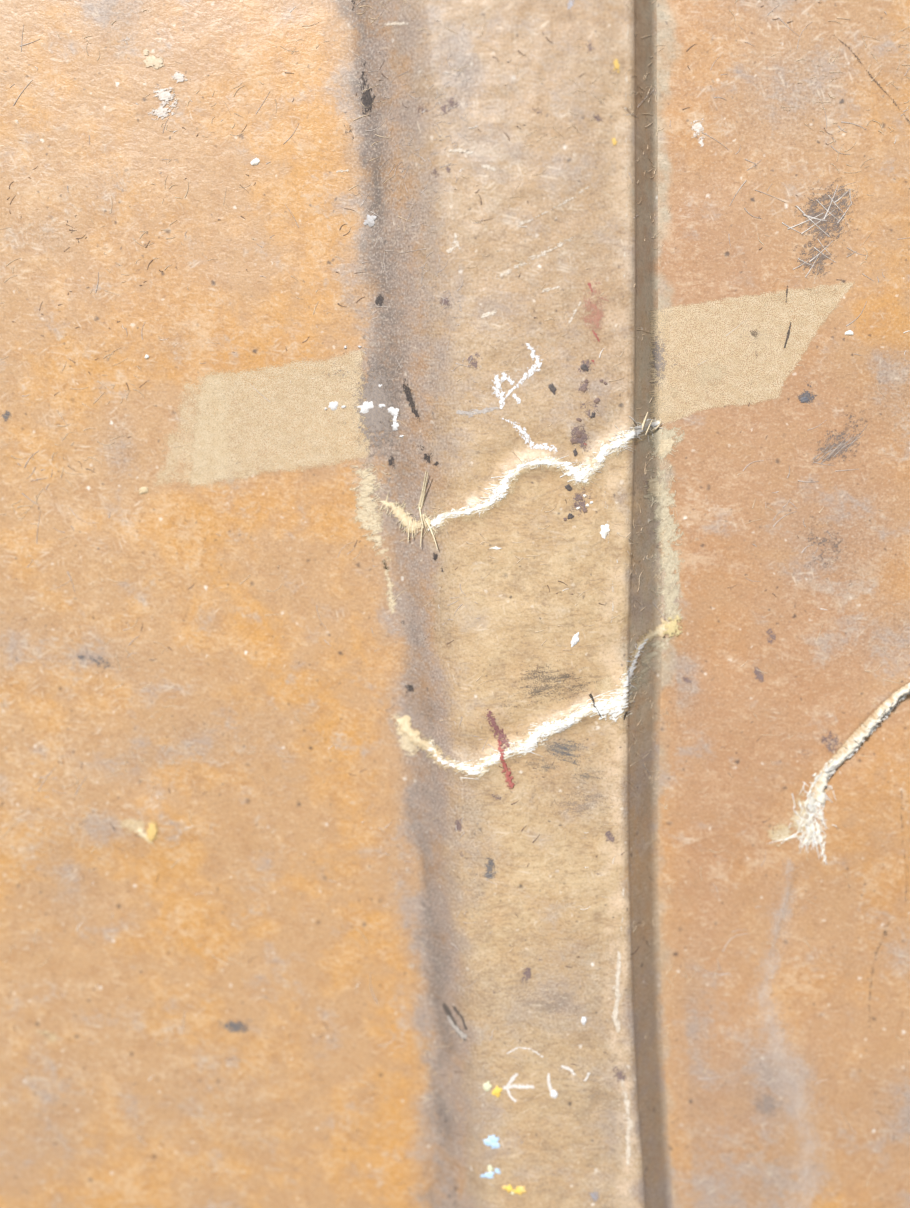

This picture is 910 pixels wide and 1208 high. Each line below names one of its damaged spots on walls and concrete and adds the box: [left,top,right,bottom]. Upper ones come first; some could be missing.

crack [376,412,661,549]
crack [390,615,683,787]
crack [764,679,910,864]